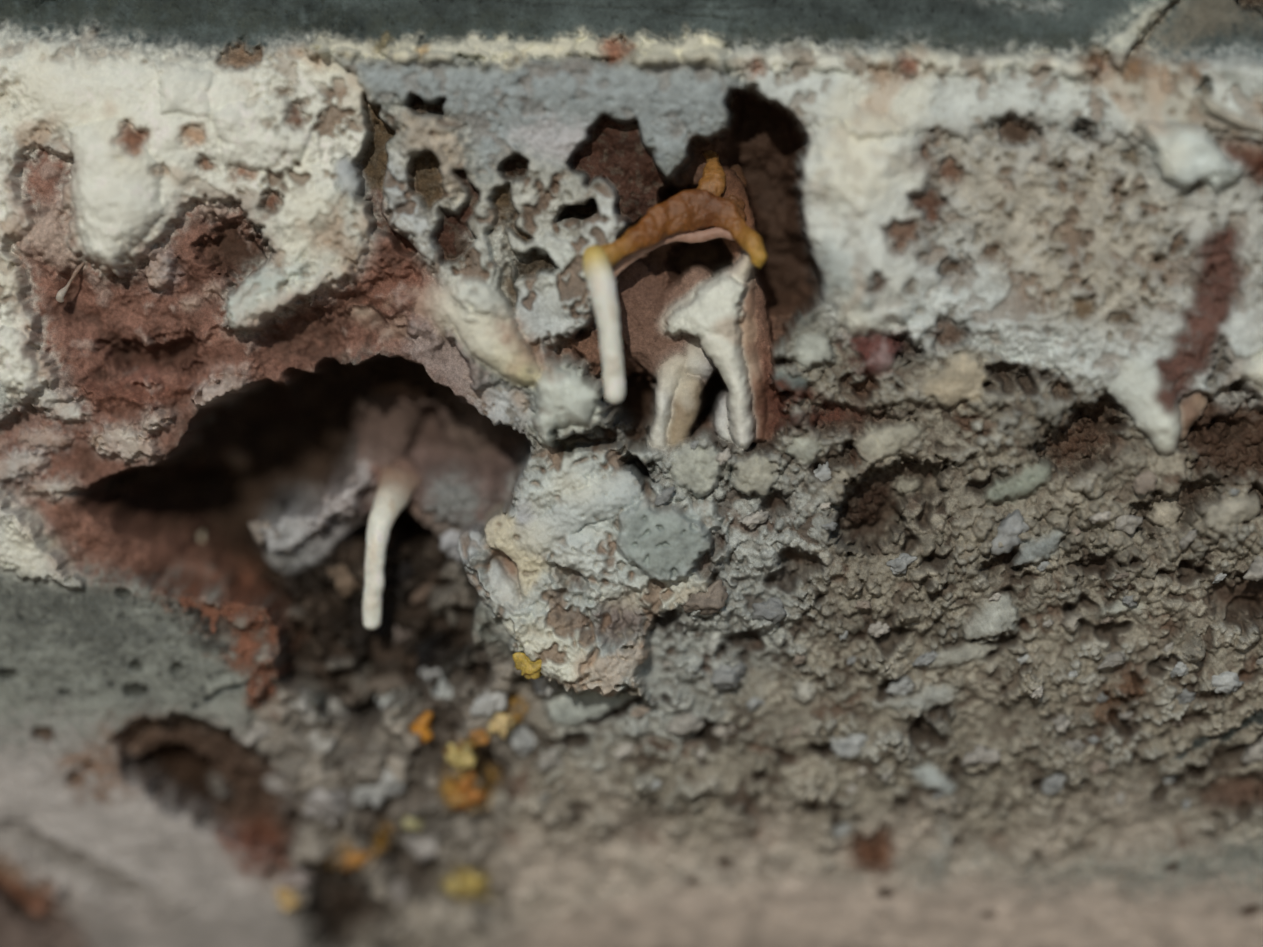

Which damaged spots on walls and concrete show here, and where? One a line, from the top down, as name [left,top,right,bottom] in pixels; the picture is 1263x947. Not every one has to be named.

spalling [112,121,150,158]
spalling [180,124,259,182]
spalling [218,44,265,71]
spalling [274,84,305,131]
spalling [744,58,767,78]
crack [1125,0,1183,64]
spalling [1194,78,1213,97]
water stain [0,0,1263,409]
corrosion [1157,229,1241,412]
spalling [484,90,1263,918]
spalling [0,148,564,947]
corrosion [163,574,290,707]